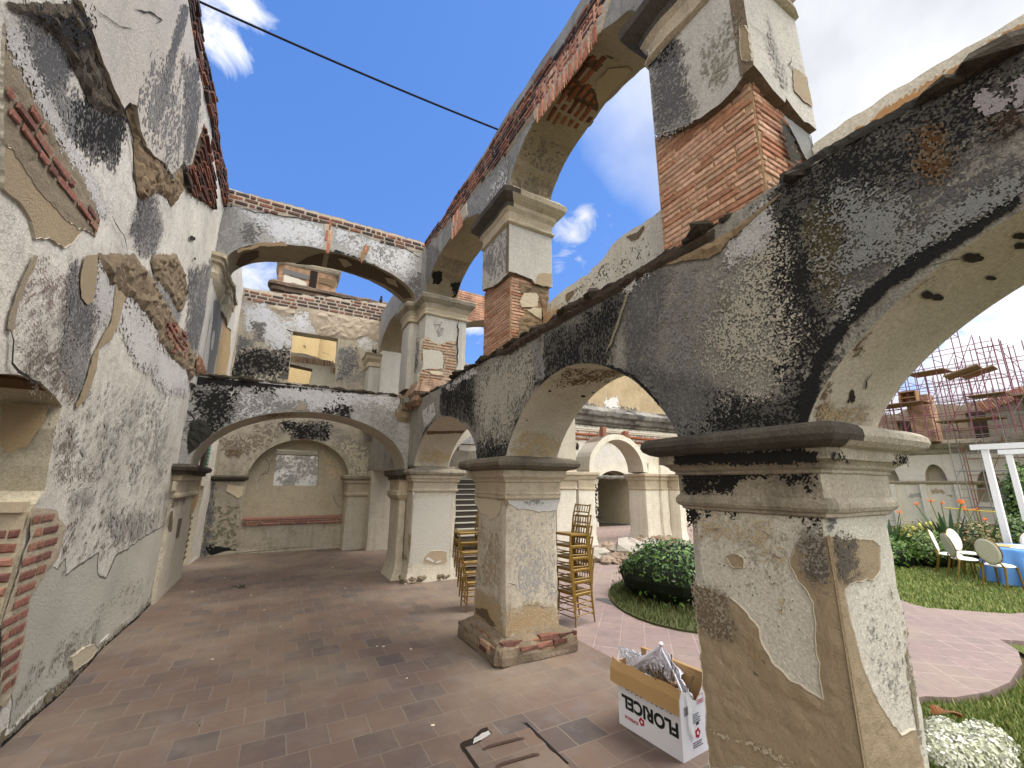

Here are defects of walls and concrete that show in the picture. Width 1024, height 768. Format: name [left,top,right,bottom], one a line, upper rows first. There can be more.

spalling [0,23,100,249]
leakage [6,5,202,220]
flaking render [166,320,189,360]
leakage [0,205,468,575]
flaking render [182,0,614,299]
spalling [417,337,457,384]
leakage [647,4,744,144]
flaking render [483,82,922,357]
leakage [531,50,1024,436]
flaking render [793,68,813,106]
spalling [0,508,67,707]
spalling [694,534,925,768]